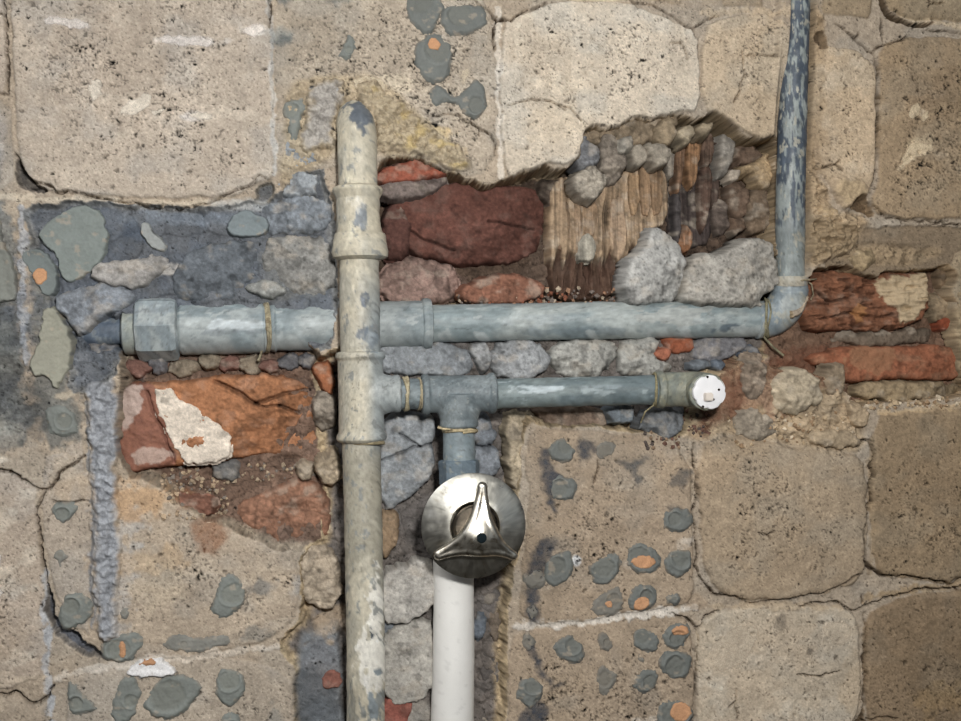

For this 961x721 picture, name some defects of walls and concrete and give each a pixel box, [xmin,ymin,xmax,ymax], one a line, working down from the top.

crack [0,0,11,96]
crack [15,154,270,212]
spalling [377,157,568,192]
crack [475,1,545,49]
spalling [584,112,777,258]
crack [842,0,961,227]
crack [0,455,88,586]
spalling [0,160,347,721]
spalling [382,409,443,571]
spalling [420,605,433,628]
spalling [474,549,520,721]
crack [675,438,961,721]